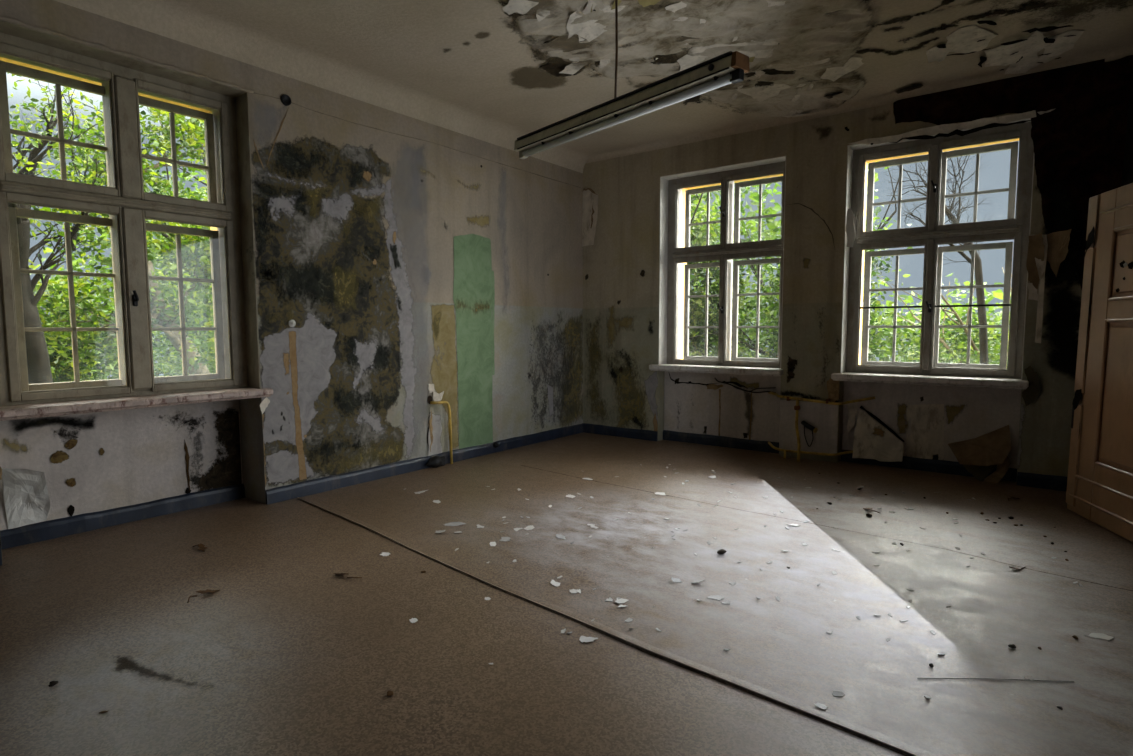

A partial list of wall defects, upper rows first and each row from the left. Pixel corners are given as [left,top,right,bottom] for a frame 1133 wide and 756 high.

peeling [499,0,874,117]
water stain [895,84,923,94]
water stain [856,0,1133,56]
peeling [845,20,1133,379]
flaking render [260,313,337,486]
water stain [528,306,646,429]
spalling [1018,366,1041,468]